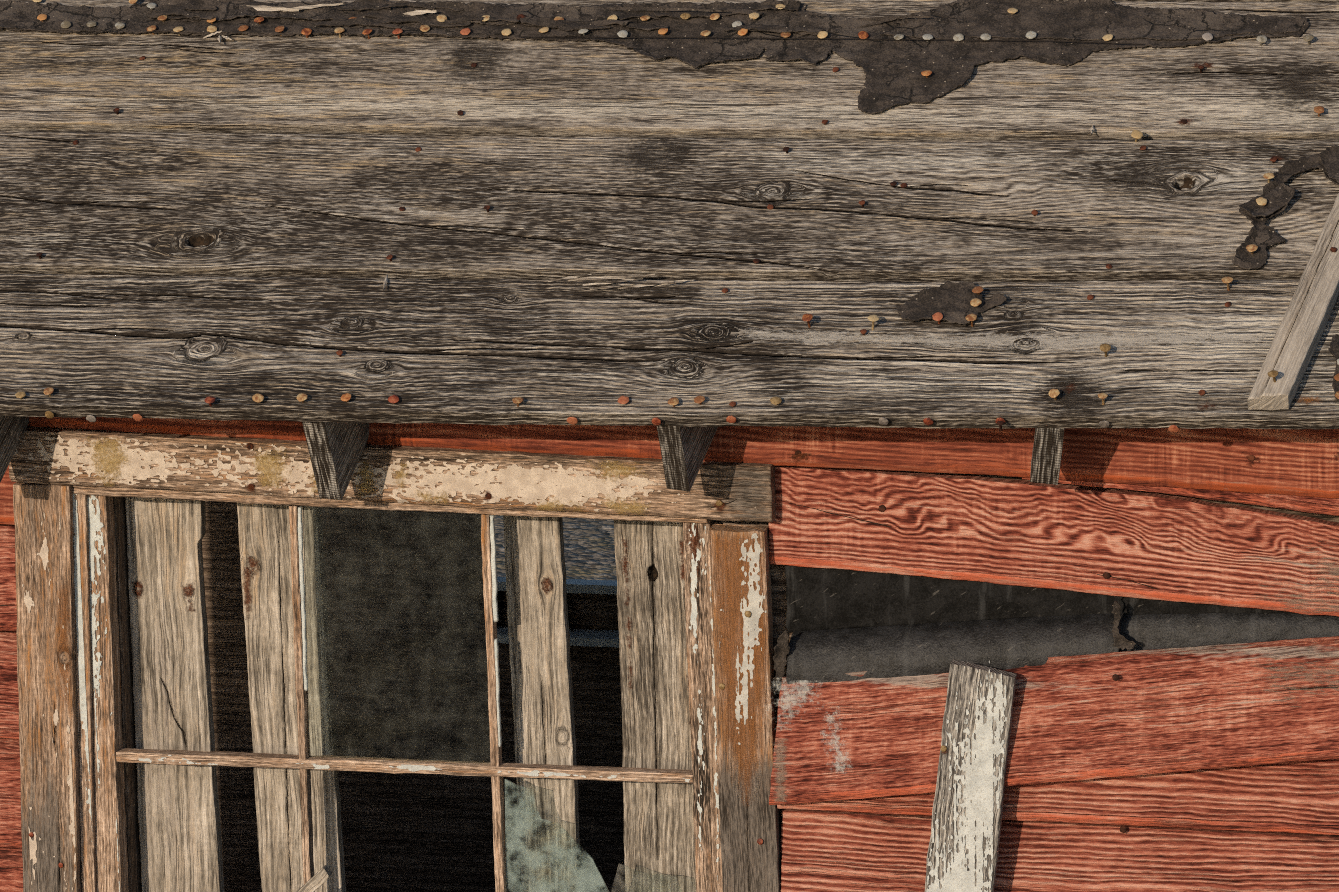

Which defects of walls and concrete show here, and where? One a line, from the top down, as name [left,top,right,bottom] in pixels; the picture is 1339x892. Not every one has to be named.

peeling [344,452,684,512]
peeling [15,434,319,891]
crack [160,678,187,747]
peeling [385,764,442,772]
peeling [497,770,637,780]
peeling [683,523,722,880]
peeling [735,533,767,745]
peeling [926,660,1010,892]